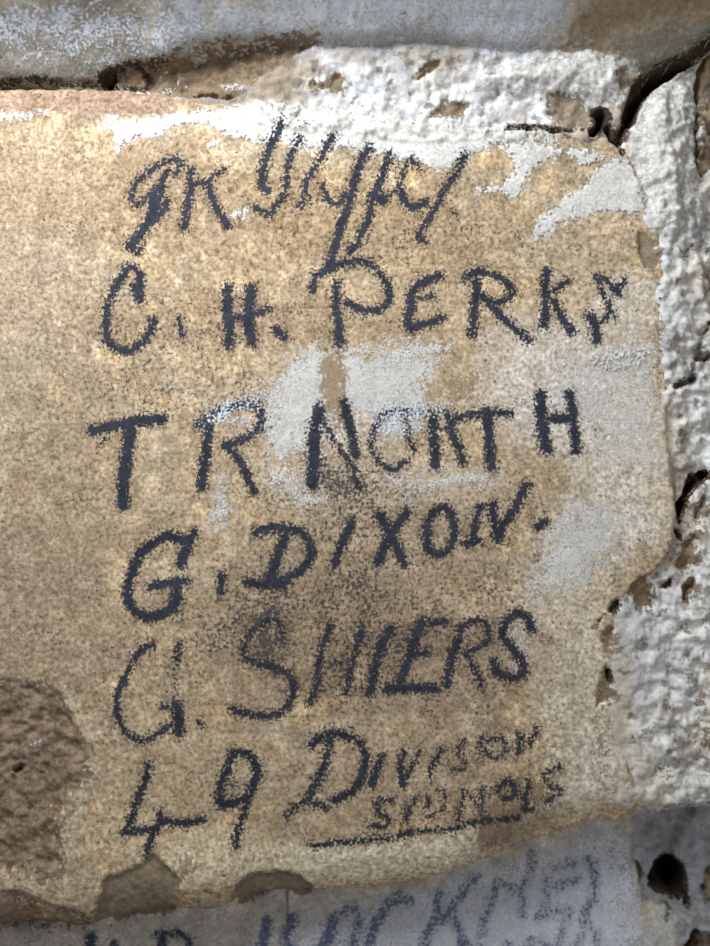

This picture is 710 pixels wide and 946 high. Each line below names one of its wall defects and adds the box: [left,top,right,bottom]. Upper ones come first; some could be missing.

efflorescence [0,0,570,69]
crack [616,32,710,145]